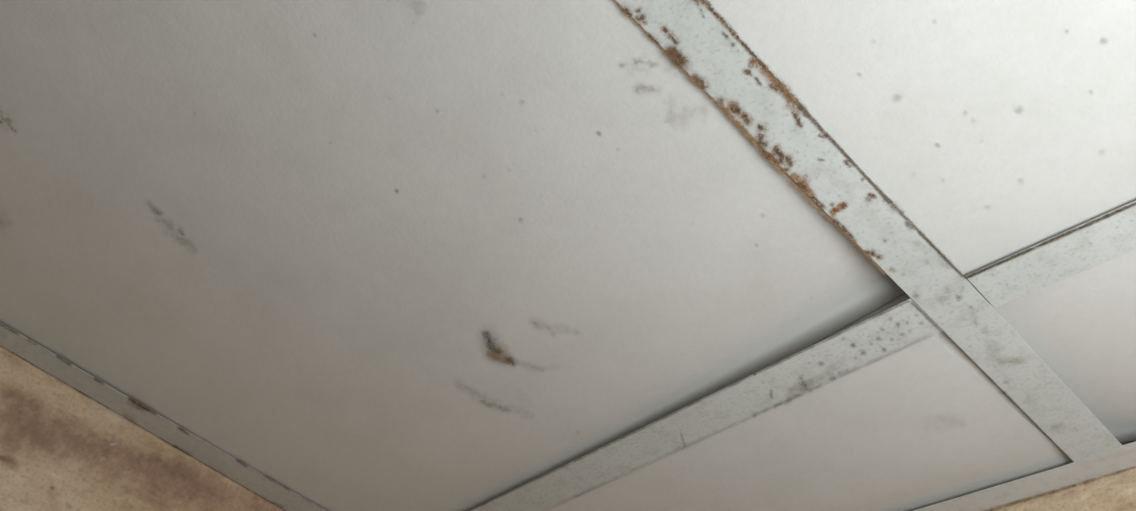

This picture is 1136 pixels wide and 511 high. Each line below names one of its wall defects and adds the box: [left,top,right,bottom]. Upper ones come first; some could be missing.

rust [617,0,957,274]